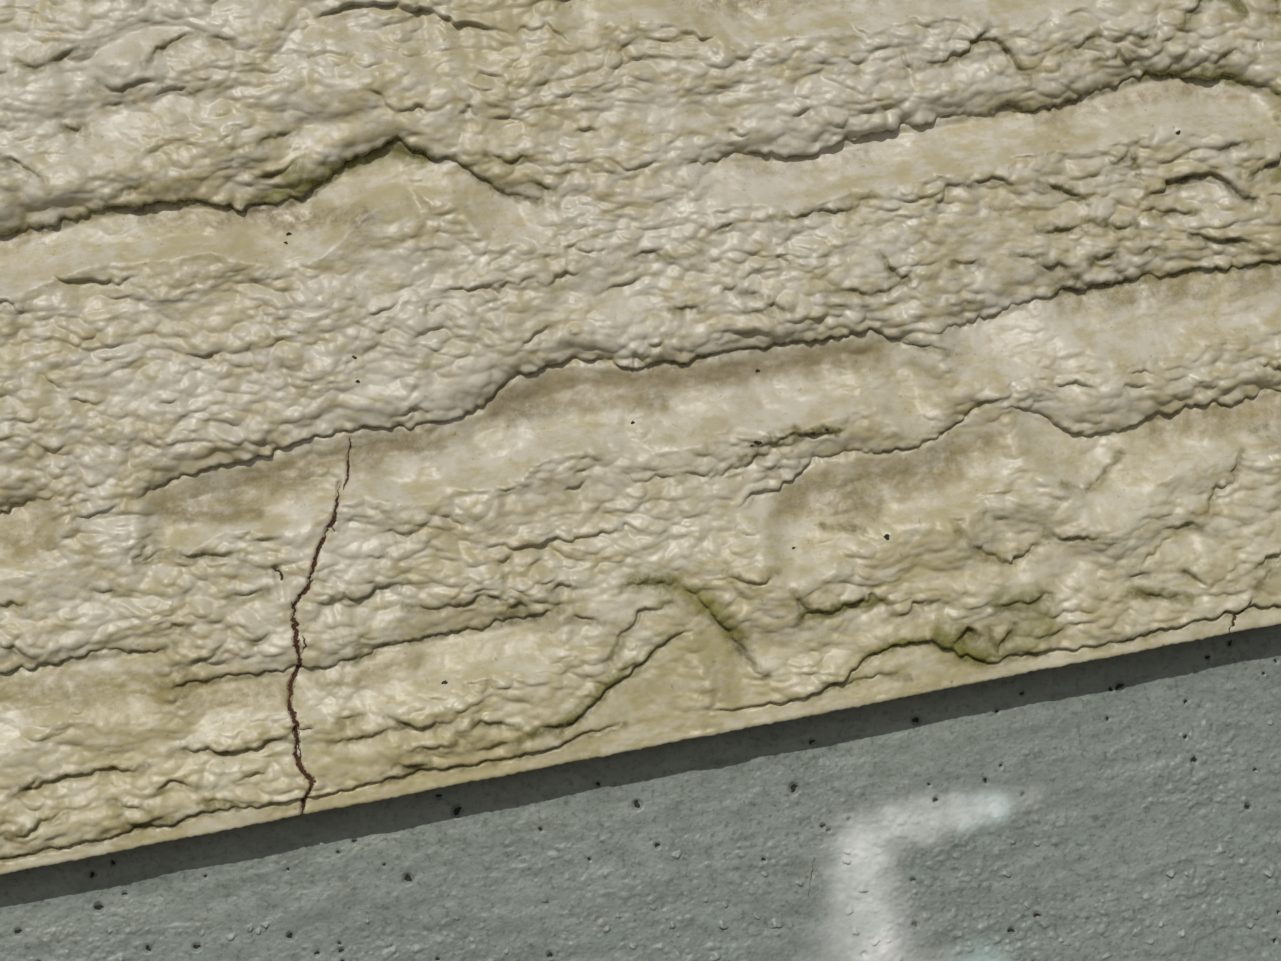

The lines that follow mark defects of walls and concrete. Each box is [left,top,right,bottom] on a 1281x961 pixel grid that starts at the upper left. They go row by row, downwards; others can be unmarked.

crack [273,438,351,816]